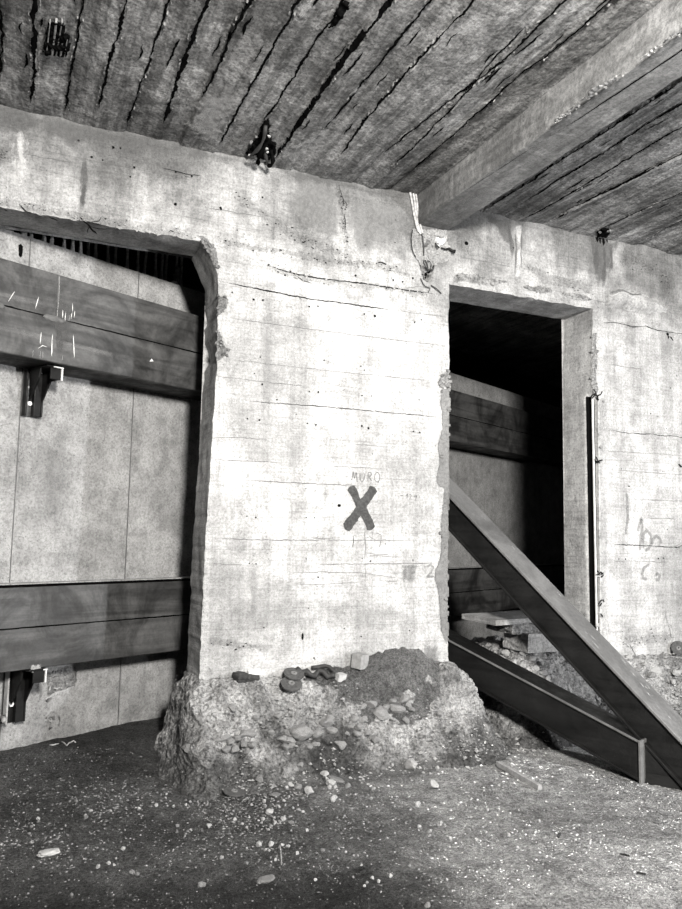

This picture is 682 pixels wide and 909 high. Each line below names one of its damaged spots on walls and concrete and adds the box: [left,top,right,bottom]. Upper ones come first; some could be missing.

crack [0,0,43,100]
crack [62,0,87,112]
crack [96,0,255,124]
crack [219,0,344,144]
crack [276,0,477,159]
crack [486,50,682,222]
spalling [554,74,624,124]
spalling [640,27,682,59]
crack [598,191,682,239]
spalling [214,330,230,361]
spalling [216,294,229,316]
peeling [434,369,453,644]